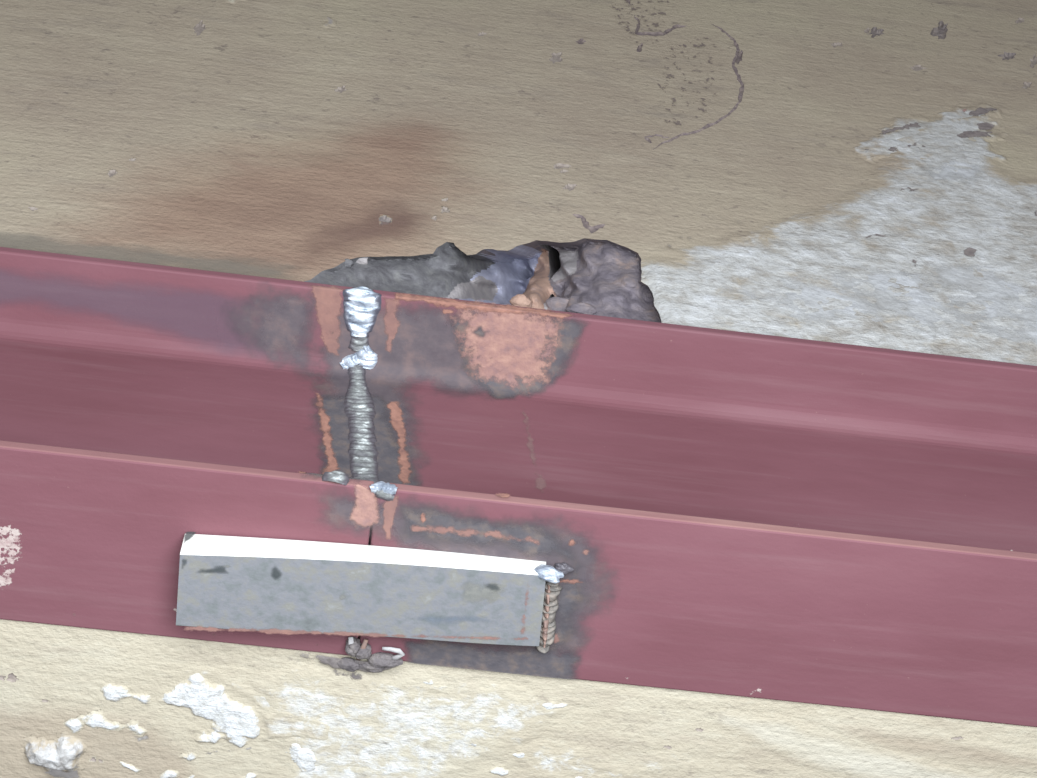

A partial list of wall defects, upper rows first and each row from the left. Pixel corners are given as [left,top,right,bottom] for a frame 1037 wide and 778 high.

crack [625,0,686,52]
crack [644,24,744,149]
water stain [640,98,1037,366]
corrosion [312,286,343,355]
corrosion [384,293,571,388]
spalling [304,238,662,323]
corrosion [316,395,339,474]
corrosion [387,402,412,484]
corrosion [350,484,398,539]
water stain [246,661,706,778]